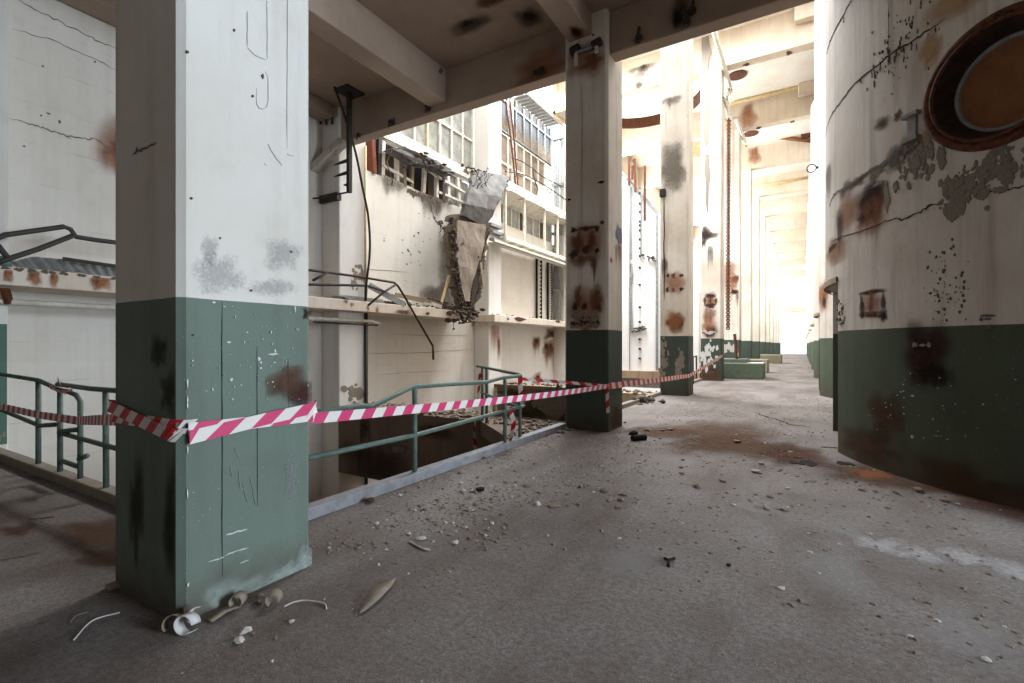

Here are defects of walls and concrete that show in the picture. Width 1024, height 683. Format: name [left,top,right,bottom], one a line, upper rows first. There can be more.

crack [14,0,115,70]
crack [825,0,948,137]
crack [9,118,116,149]
peeling [873,133,1024,223]
spalling [407,176,511,307]
rust [837,183,884,230]
crack [833,203,943,241]
rust [569,220,604,330]
rust [859,289,887,322]
peeling [658,337,685,381]
peeling [699,330,735,373]
rust [270,369,312,404]